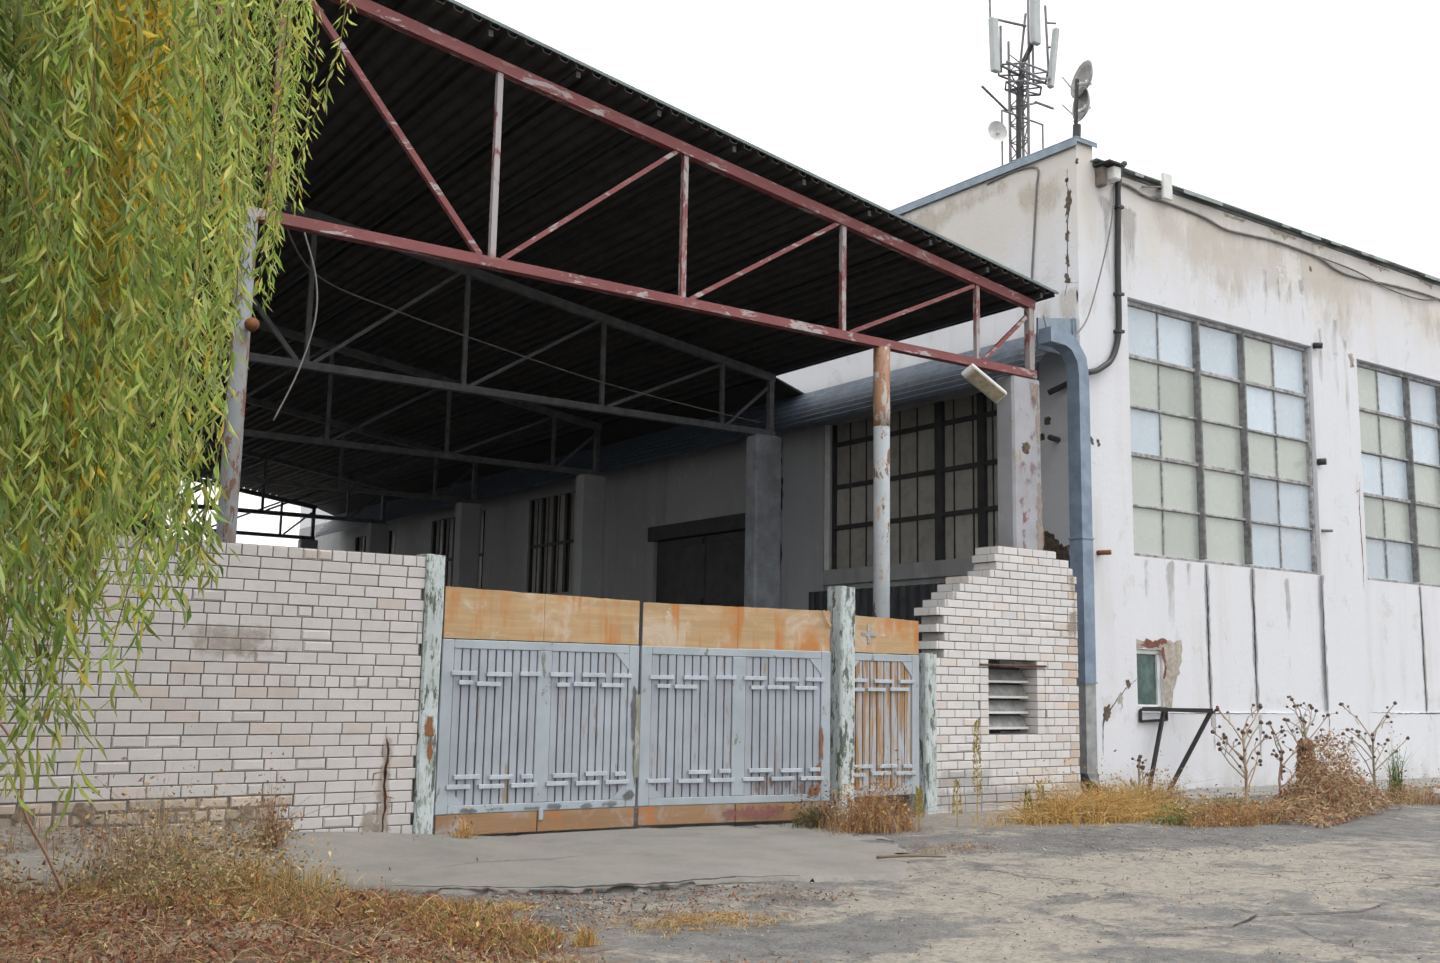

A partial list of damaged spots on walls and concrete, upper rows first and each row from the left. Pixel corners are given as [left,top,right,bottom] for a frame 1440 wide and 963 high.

flaking render [1014,416,1051,472]
flaking render [1136,638,1183,708]
rust [425,716,434,762]